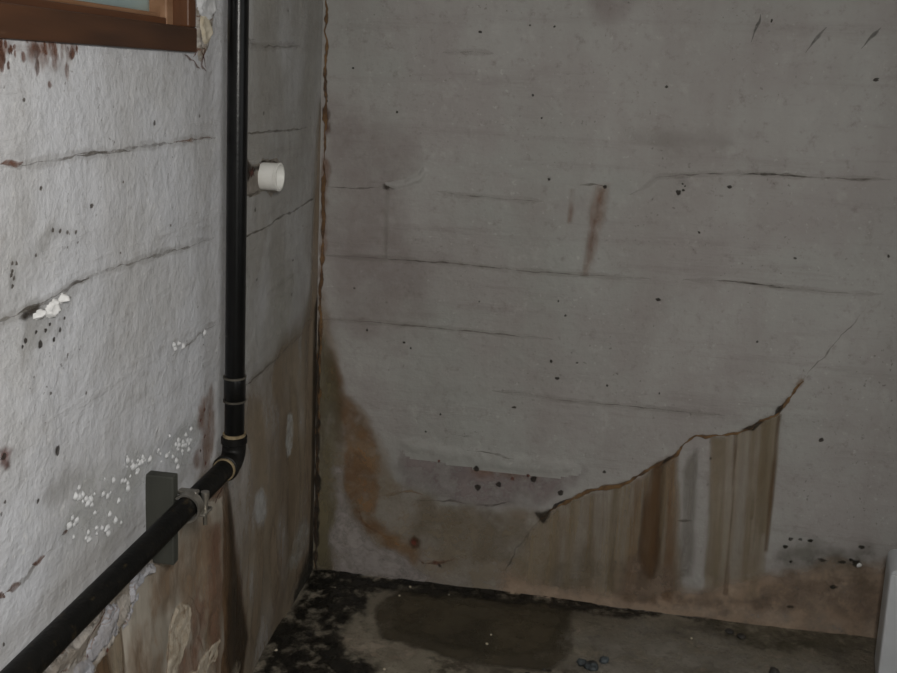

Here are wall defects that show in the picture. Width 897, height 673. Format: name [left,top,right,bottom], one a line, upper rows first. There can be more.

corrosion [0,39,78,73]
peeling [184,0,217,71]
crack [1,159,23,167]
crack [247,0,329,569]
leakage [212,106,886,673]
crack [0,556,44,598]
peeling [43,488,224,673]
leakage [94,627,125,673]